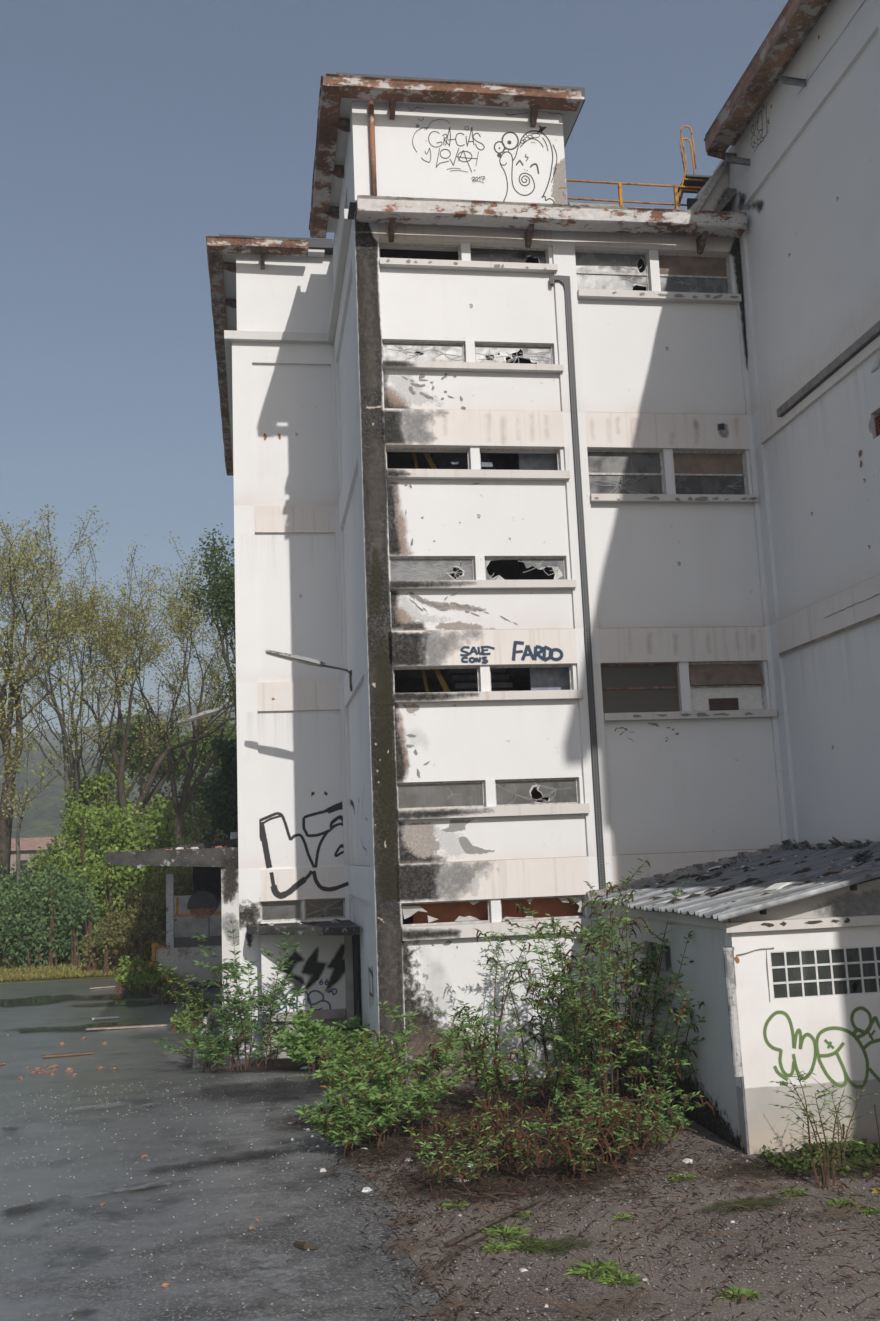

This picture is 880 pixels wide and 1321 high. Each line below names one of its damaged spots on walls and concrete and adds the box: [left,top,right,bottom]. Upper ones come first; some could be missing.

peeling [402,373,466,409]
peeling [409,564,518,625]